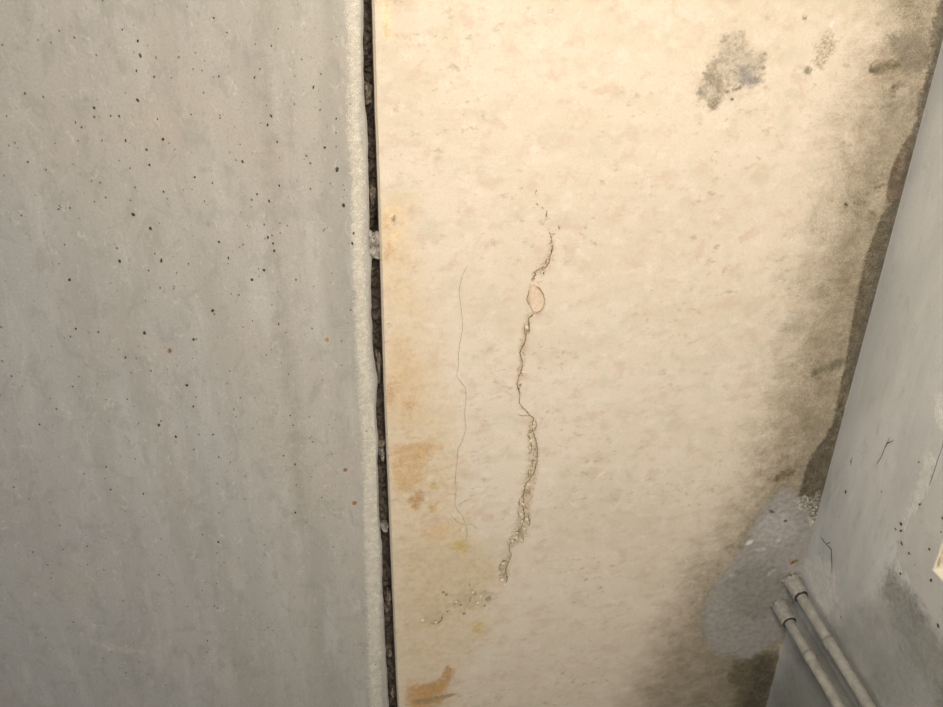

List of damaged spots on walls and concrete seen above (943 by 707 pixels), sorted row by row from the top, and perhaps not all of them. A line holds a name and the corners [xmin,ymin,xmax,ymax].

crack [420,190,560,627]
damp [602,0,943,707]
corrosion [402,664,457,707]